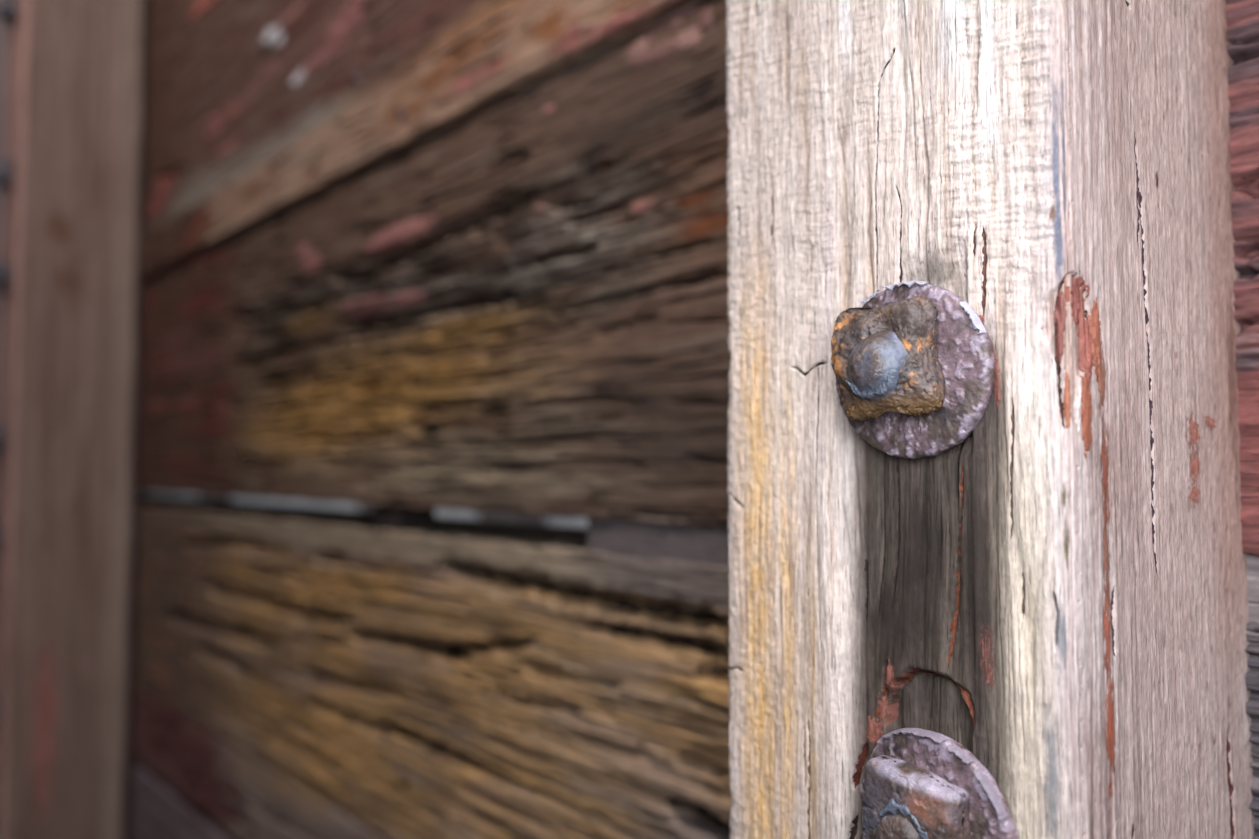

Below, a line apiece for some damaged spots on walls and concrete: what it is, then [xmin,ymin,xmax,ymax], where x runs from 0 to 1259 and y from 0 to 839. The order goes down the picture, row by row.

crack [1134,131,1159,579]
crack [803,719,811,839]
crack [850,457,975,839]